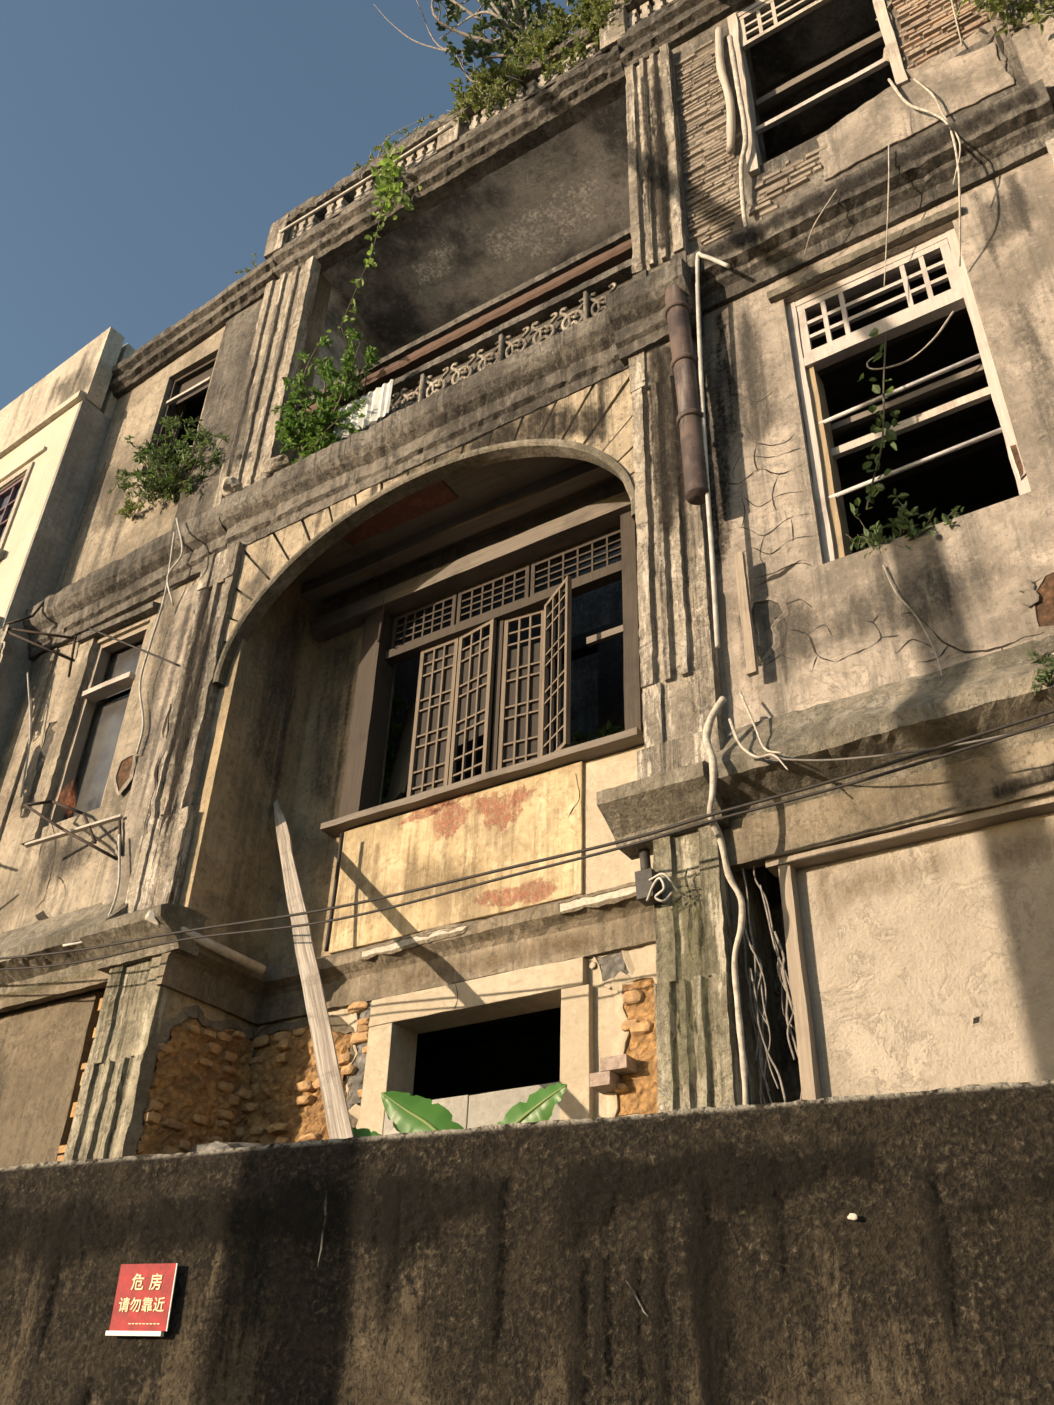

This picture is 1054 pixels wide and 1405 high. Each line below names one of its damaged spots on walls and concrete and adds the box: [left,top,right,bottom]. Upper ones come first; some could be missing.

flaking render [674,0,1015,247]
spalling [0,624,9,662]
crack [717,391,1044,670]
spalling [1019,557,1054,661]
spalling [123,1005,309,1157]
spalling [329,1001,371,1128]
damp [0,1166,504,1364]
damp [550,1141,870,1405]